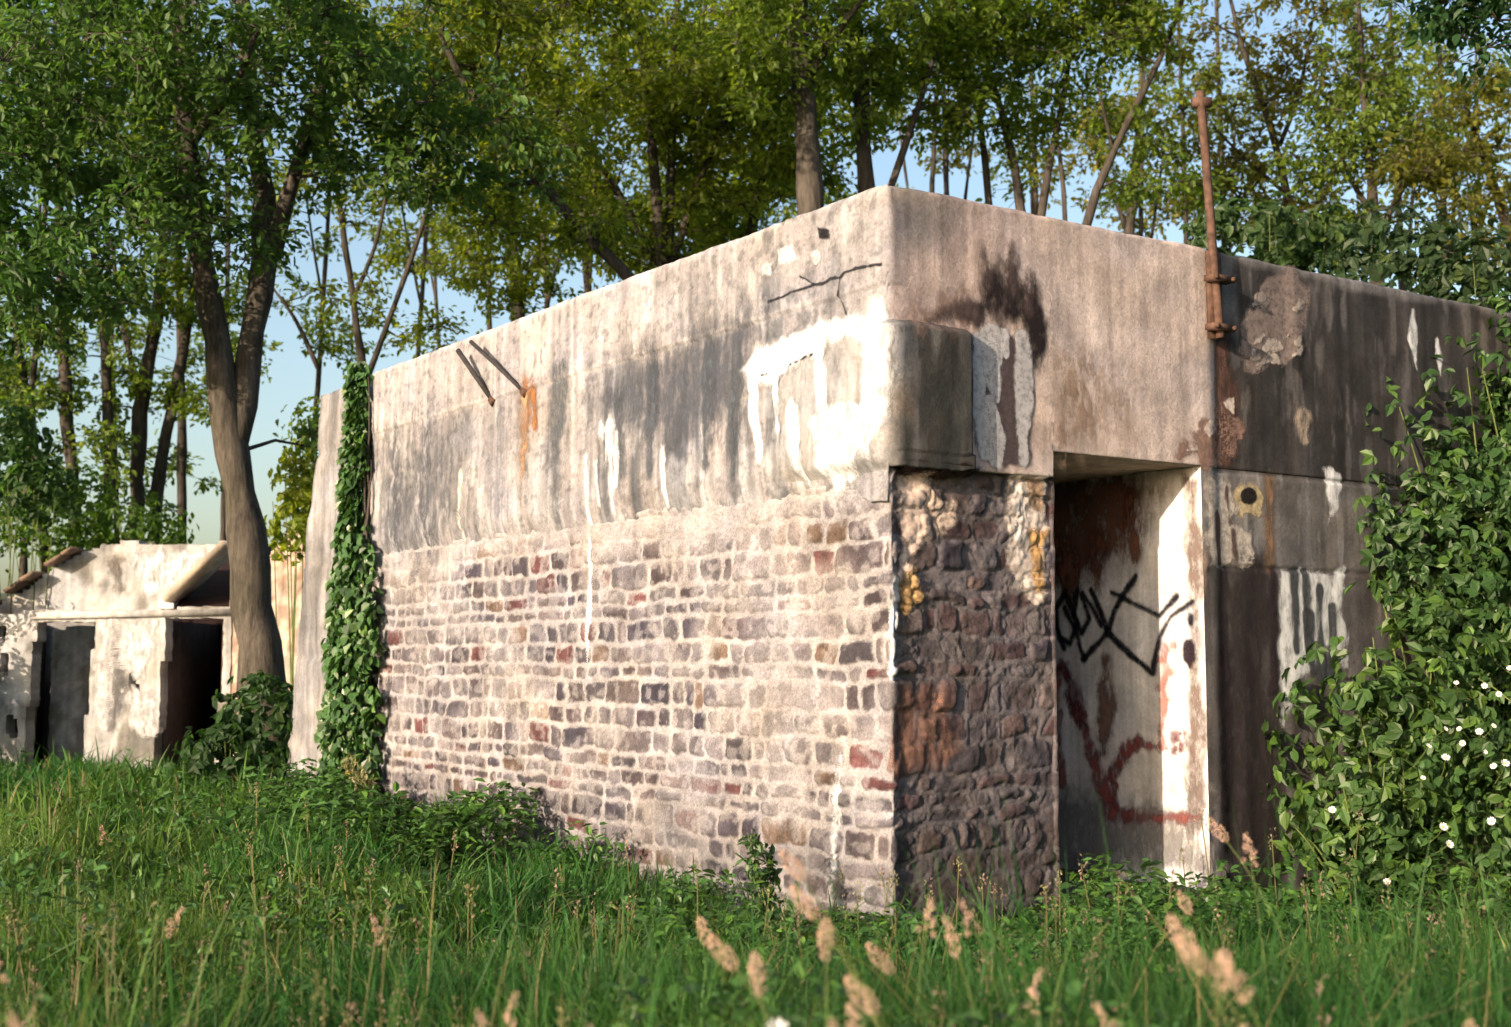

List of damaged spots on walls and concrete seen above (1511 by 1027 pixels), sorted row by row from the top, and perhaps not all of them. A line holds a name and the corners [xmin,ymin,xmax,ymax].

crack [768,263,882,315]
leakage [913,243,1048,367]
spalling [1239,266,1311,374]
leakage [1408,309,1442,375]
corrosion [521,379,537,476]
leakage [551,362,567,449]
leakage [584,297,891,656]
peeling [894,323,1050,615]
leakage [1296,408,1310,445]